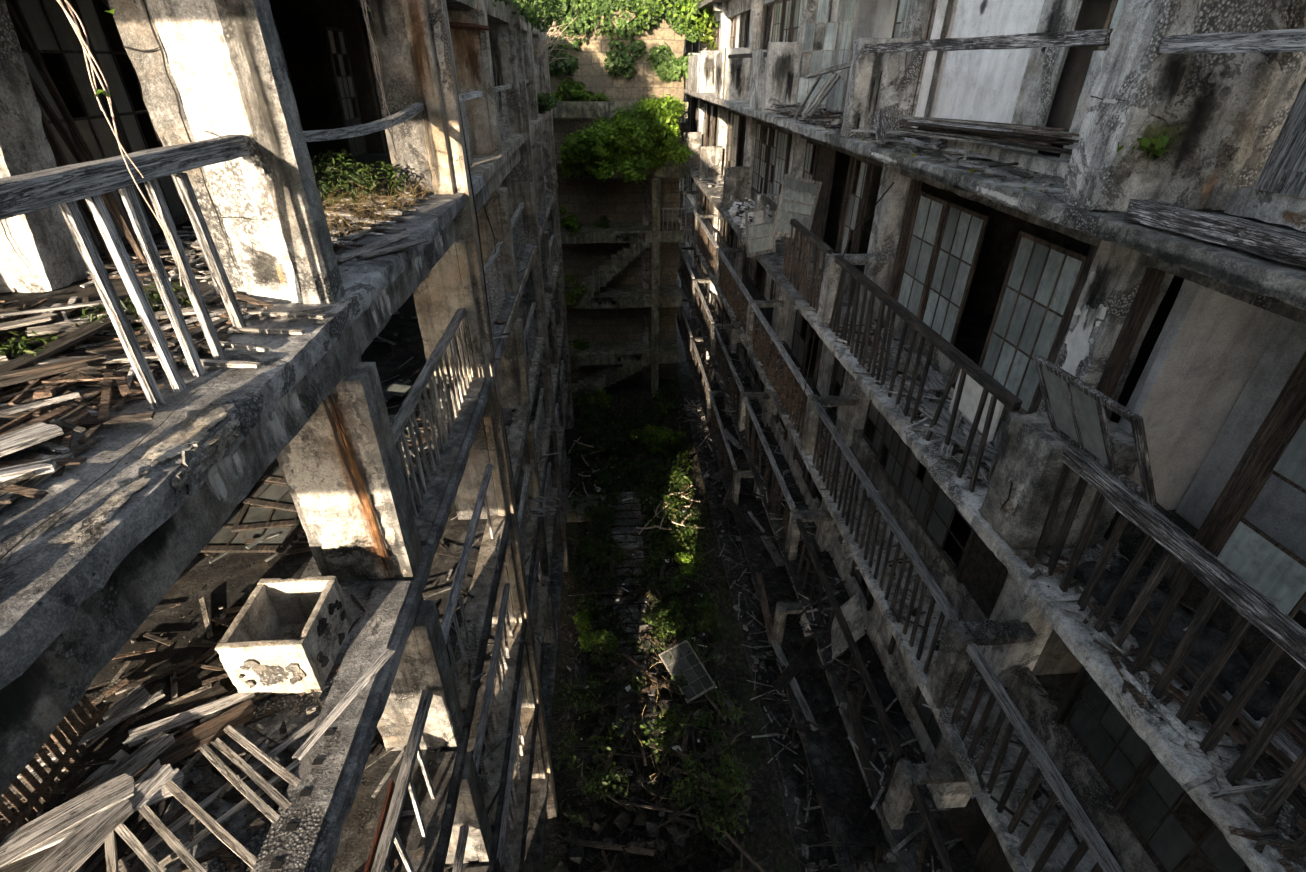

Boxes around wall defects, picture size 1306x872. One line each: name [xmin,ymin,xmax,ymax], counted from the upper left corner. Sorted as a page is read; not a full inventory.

leakage [1158,54,1186,99]
leakage [1153,70,1225,175]
peeling [1060,304,1107,376]
spalling [55,398,251,544]
corrosion [331,412,382,551]
leakage [0,660,54,745]